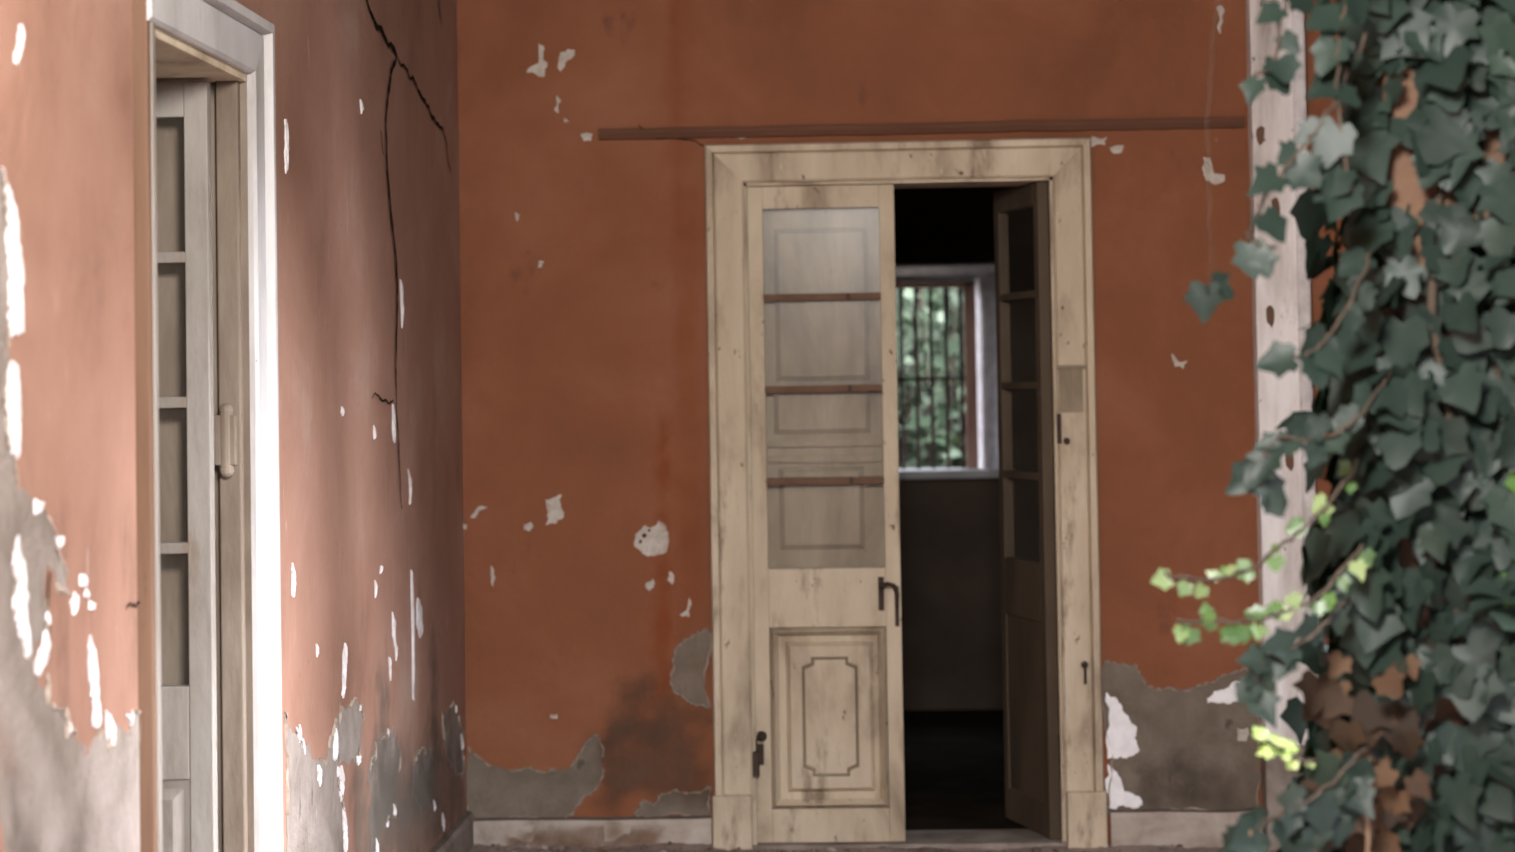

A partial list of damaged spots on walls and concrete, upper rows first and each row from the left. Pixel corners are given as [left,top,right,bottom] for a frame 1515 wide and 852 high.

crack [367,0,451,507]
peeling [0,167,141,852]
peeling [388,570,423,700]
peeling [524,494,564,531]
peeling [634,520,669,556]
peeling [645,571,674,591]
peeling [669,598,712,709]
peeling [284,643,605,852]
peeling [634,785,712,818]
peeling [1101,660,1262,814]